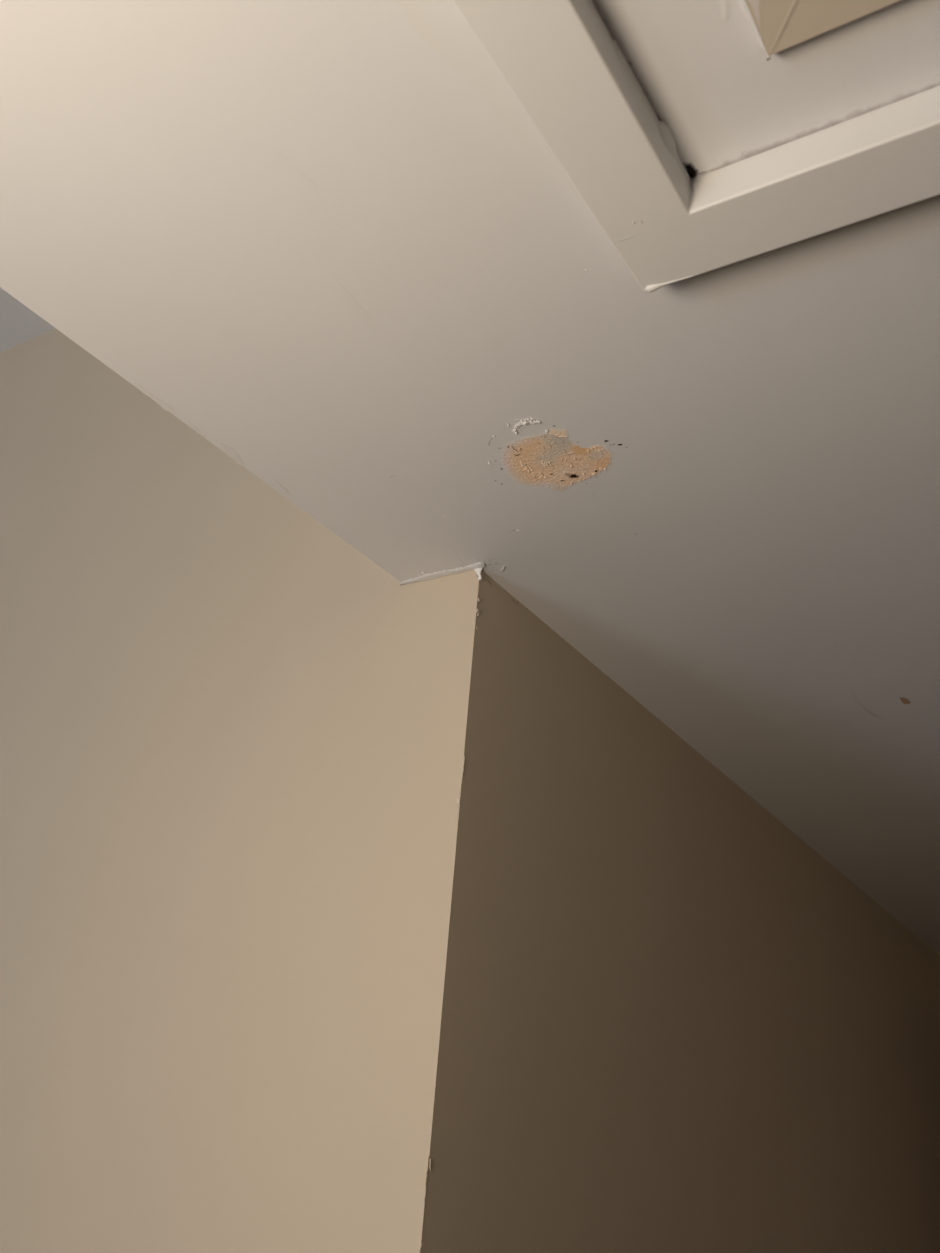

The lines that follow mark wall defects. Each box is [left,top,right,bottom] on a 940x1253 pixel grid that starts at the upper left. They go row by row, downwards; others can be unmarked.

spalling [488,418,628,495]